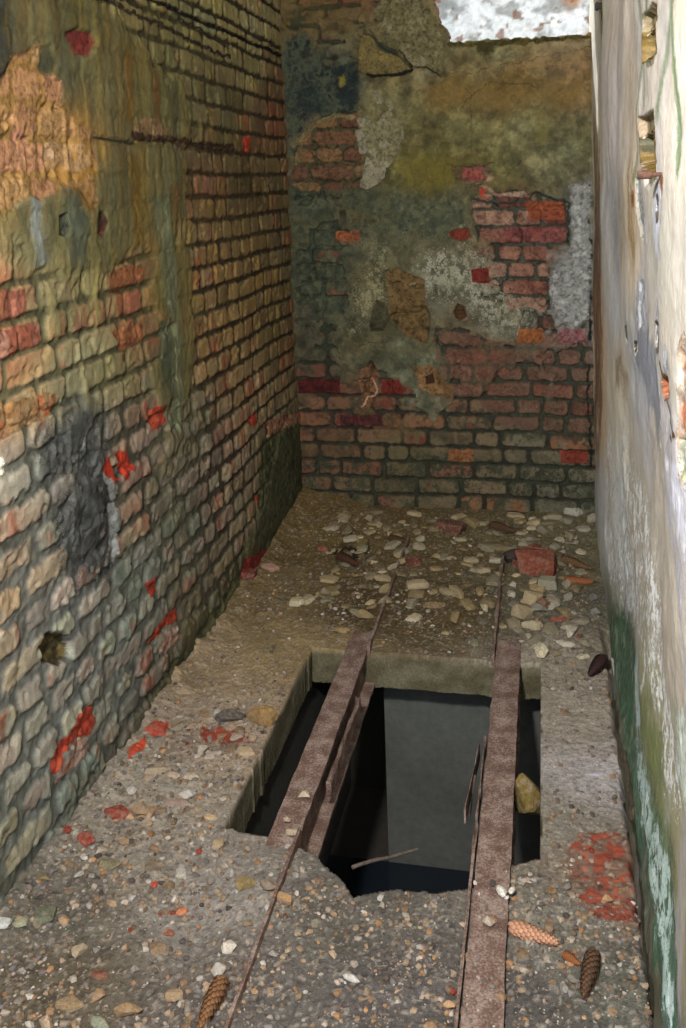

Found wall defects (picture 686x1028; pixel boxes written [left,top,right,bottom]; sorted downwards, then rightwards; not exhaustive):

spalling [0,288,40,360]
spalling [0,42,99,214]
spalling [65,29,96,56]
flaking render [291,27,413,193]
spalling [340,361,454,427]
leakage [282,0,686,822]
flaking render [445,164,572,343]
spalling [635,108,662,261]
spalling [641,2,658,68]
spalling [624,275,686,492]
corrosion [326,696,361,797]
corrosion [464,736,487,862]